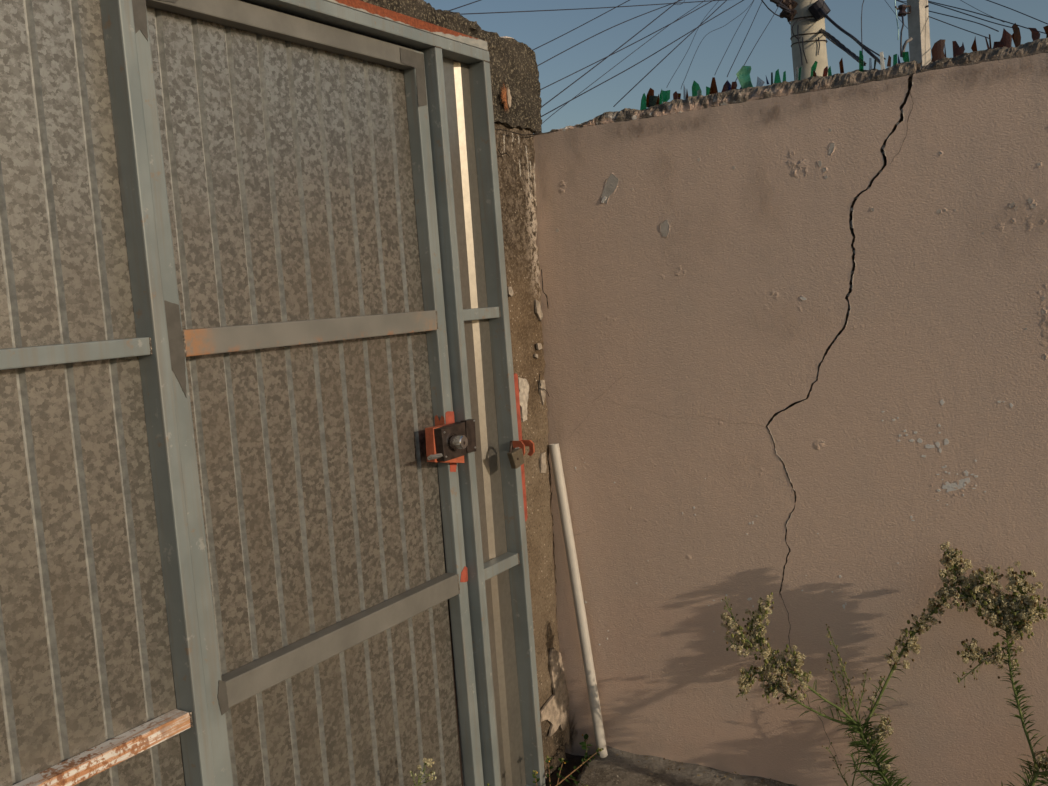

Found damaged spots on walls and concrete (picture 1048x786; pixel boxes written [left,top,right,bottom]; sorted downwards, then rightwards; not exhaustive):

peeling [540,648,569,737]
crack [609,62,922,762]